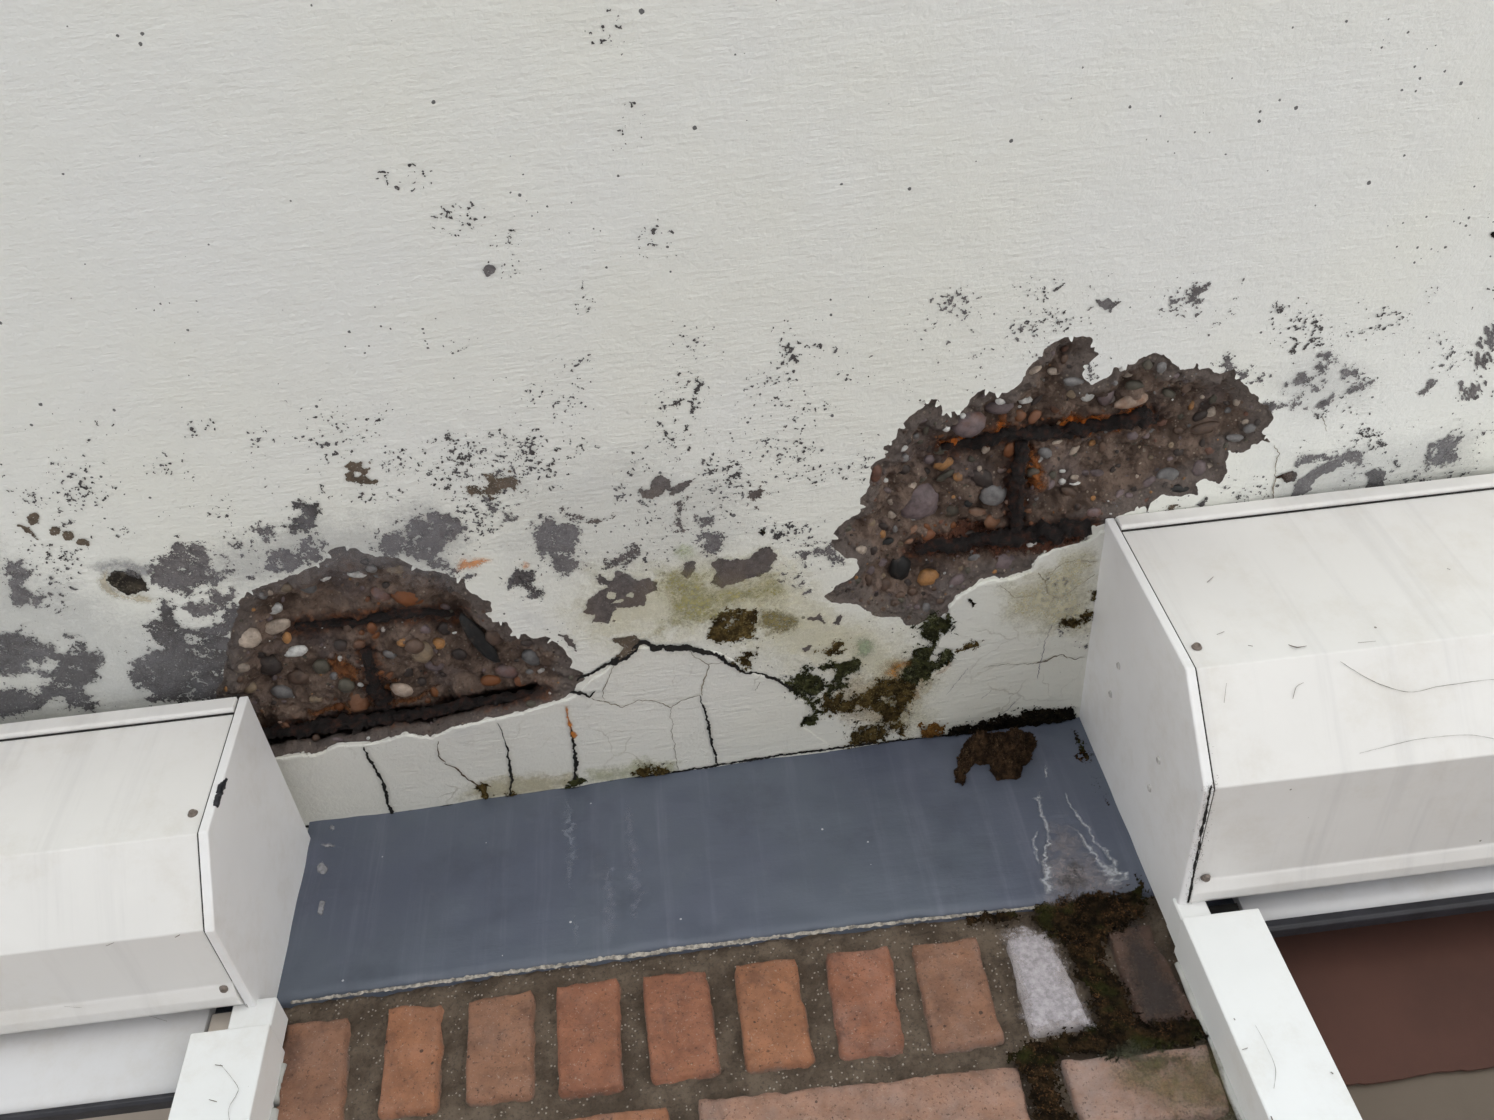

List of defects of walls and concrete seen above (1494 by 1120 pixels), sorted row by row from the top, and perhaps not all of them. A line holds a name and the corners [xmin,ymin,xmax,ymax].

spalling [106,271,1494,757]
corrosion [913,405,1159,559]
corrosion [294,607,455,630]
corrosion [262,646,535,740]
crack [363,640,957,814]
water stain [666,571,798,632]